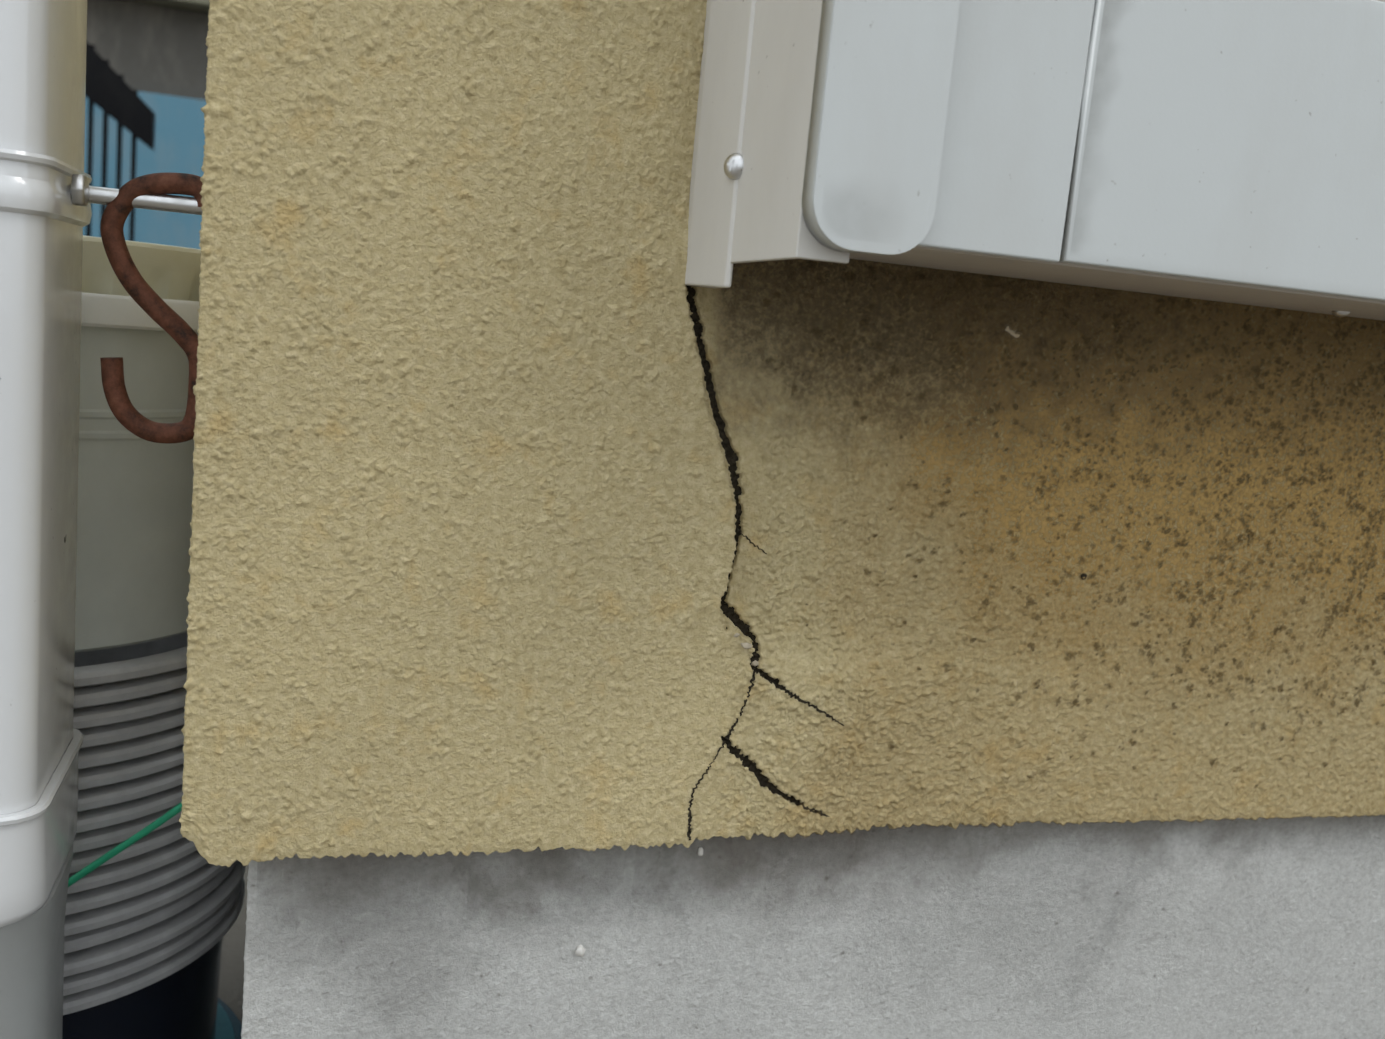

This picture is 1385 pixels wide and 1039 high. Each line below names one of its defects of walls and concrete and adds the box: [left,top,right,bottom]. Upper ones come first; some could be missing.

crack [686,285,844,840]
leakage [814,268,1385,713]